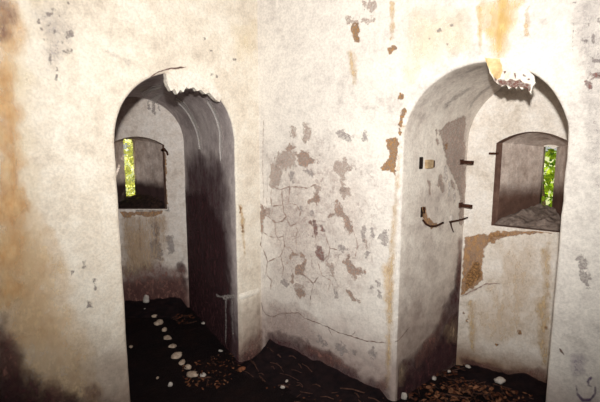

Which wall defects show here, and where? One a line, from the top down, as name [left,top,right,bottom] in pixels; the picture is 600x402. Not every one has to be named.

flaking render [346,1,377,43]
rust [487,0,515,50]
peeling [163,70,222,102]
peeling [484,57,537,95]
flaking render [269,122,318,188]
flaking render [381,108,407,175]
crack [260,120,337,300]
flaking render [328,157,353,234]
flaking render [339,245,366,279]
flaking render [461,233,506,295]
leakage [0,238,95,402]
crack [261,302,410,343]